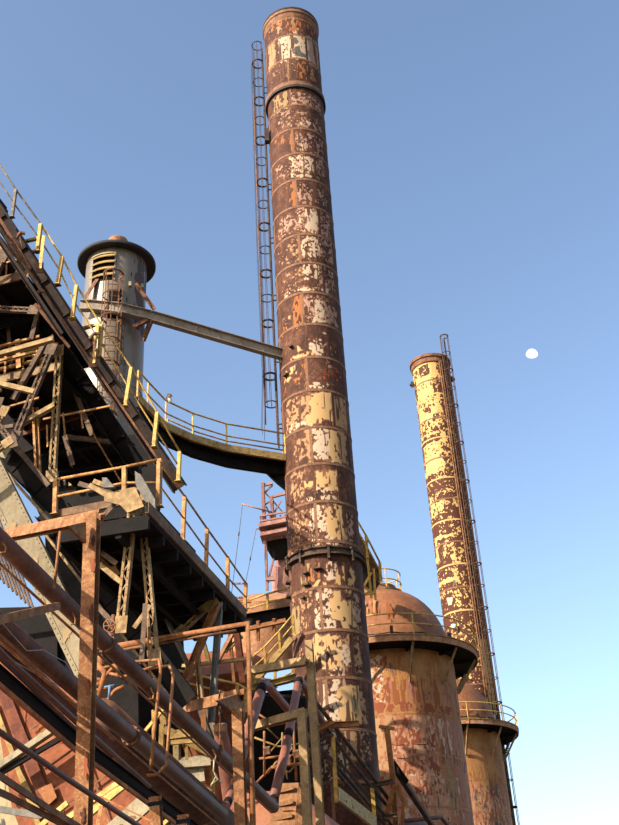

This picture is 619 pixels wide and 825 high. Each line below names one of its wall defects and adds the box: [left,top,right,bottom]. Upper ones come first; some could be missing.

peeling [268,17,319,88]
corrosion [268,17,325,228]
corrosion [280,253,317,338]
peeling [275,92,338,385]
corrosion [283,352,306,437]
corrosion [290,450,320,595]
corrosion [329,476,353,547]
corrosion [413,362,487,698]
corrosion [315,644,328,678]
peeling [291,560,372,786]
corrosion [345,594,365,721]